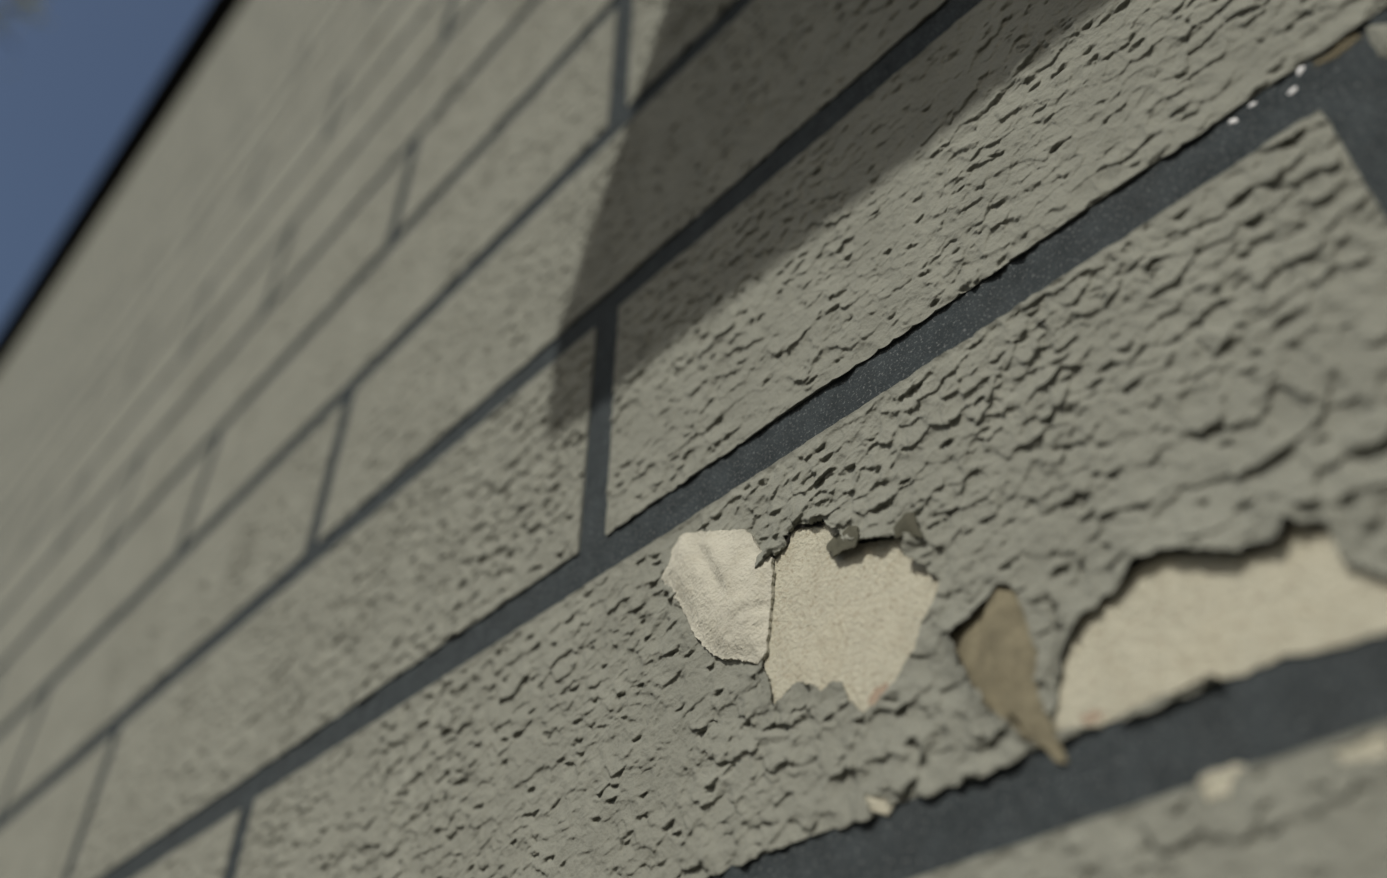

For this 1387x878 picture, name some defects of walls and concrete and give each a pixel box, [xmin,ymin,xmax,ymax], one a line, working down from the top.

peeling [661,511,940,712]
peeling [949,522,1387,765]